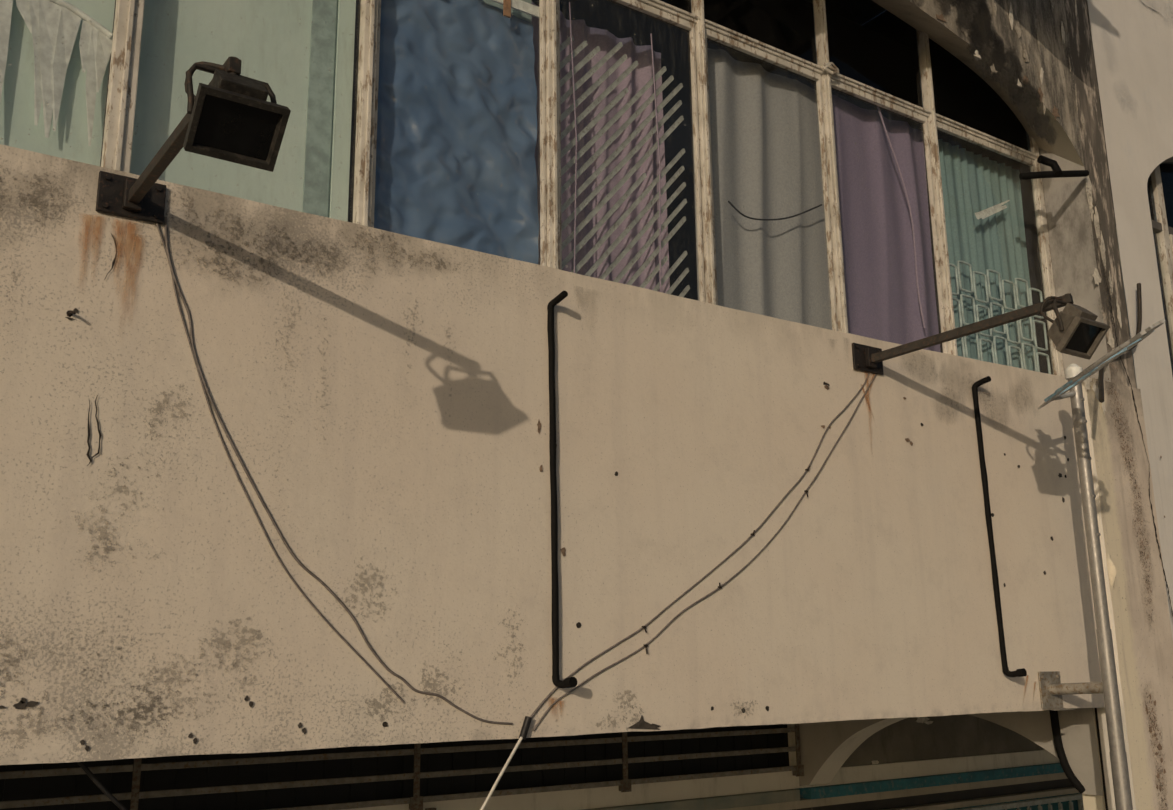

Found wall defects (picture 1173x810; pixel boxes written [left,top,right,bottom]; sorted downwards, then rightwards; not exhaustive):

mould [937,0,1056,144]